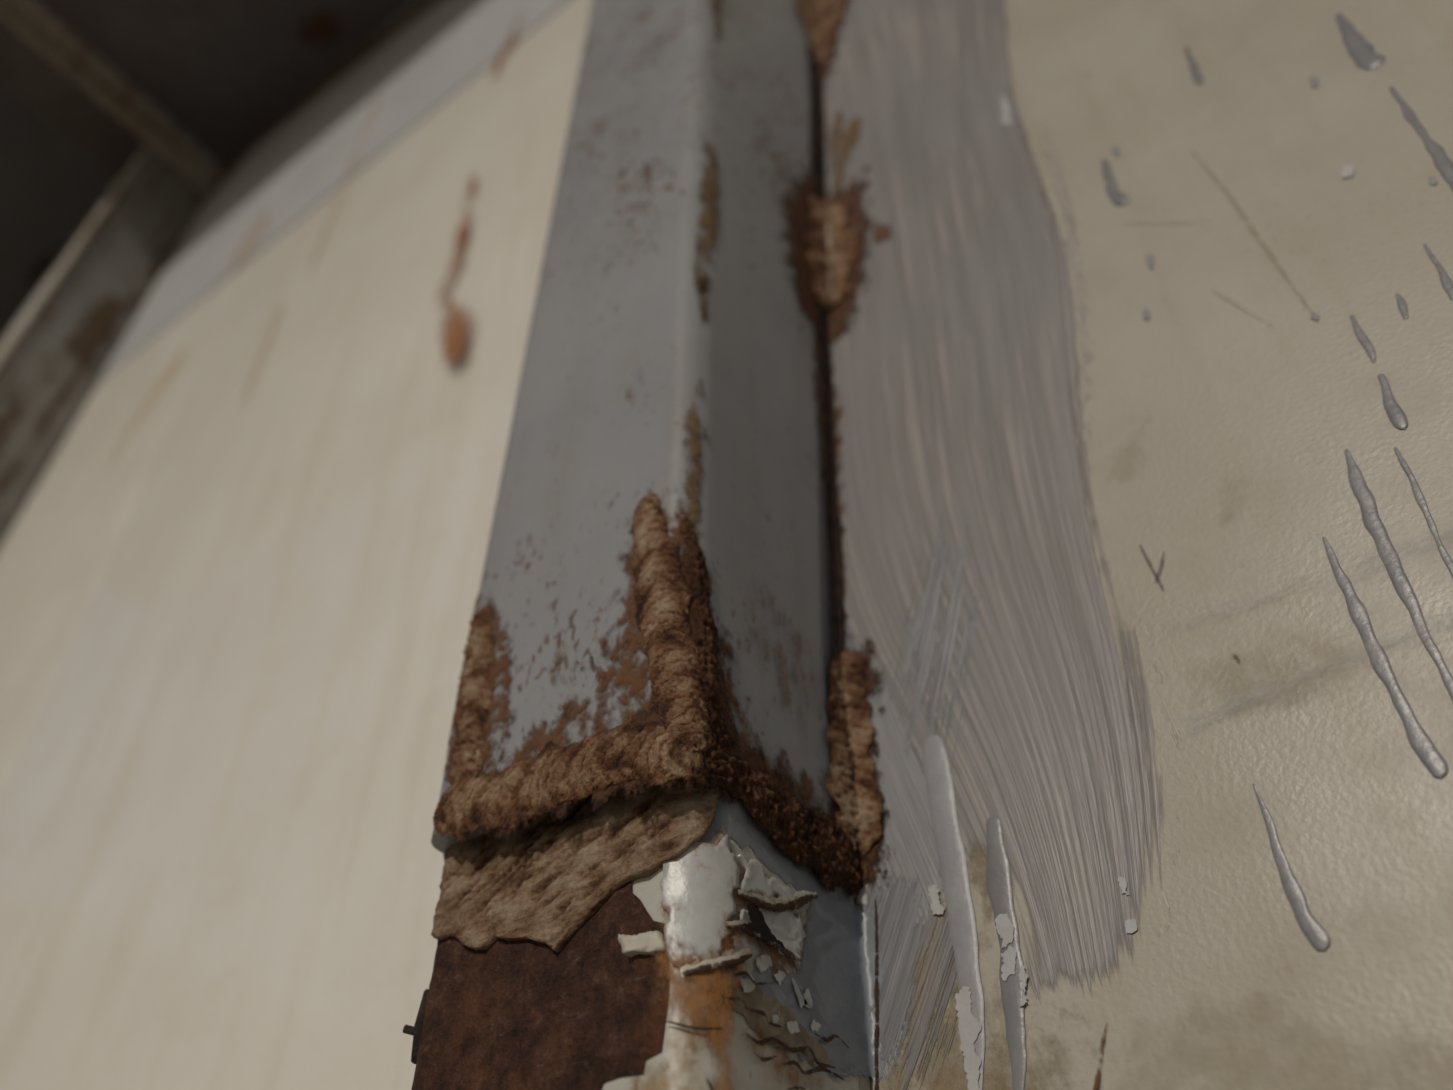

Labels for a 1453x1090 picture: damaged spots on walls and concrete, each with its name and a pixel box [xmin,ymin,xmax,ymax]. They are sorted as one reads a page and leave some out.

rust [438,177,476,362]
rust [693,142,721,322]
rust [782,118,891,345]
rust [444,381,842,841]
rust [839,638,884,711]
rust [411,881,743,1090]
peeling [431,778,831,1066]
peeling [855,883,868,905]
rust [862,810,889,885]
peeling [928,884,944,915]
peeling [955,986,982,1090]
peeling [995,913,1028,1007]